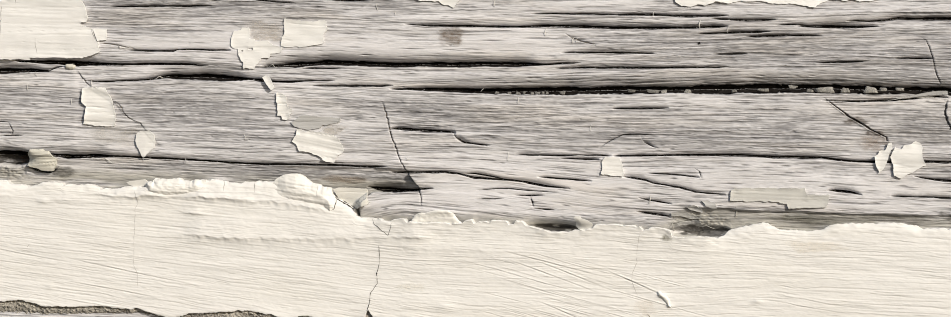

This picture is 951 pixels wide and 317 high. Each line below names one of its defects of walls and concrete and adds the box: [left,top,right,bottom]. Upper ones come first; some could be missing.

crack [113,0,220,8]
peeling [231,19,328,120]
spalling [788,85,850,93]
spalling [863,86,904,94]
peeling [81,87,116,126]
crack [0,13,951,217]
peeling [135,130,156,157]
peeling [292,129,344,163]
peeling [601,157,624,176]
peeling [874,141,926,179]
peeling [333,187,369,209]
spalling [0,300,163,317]